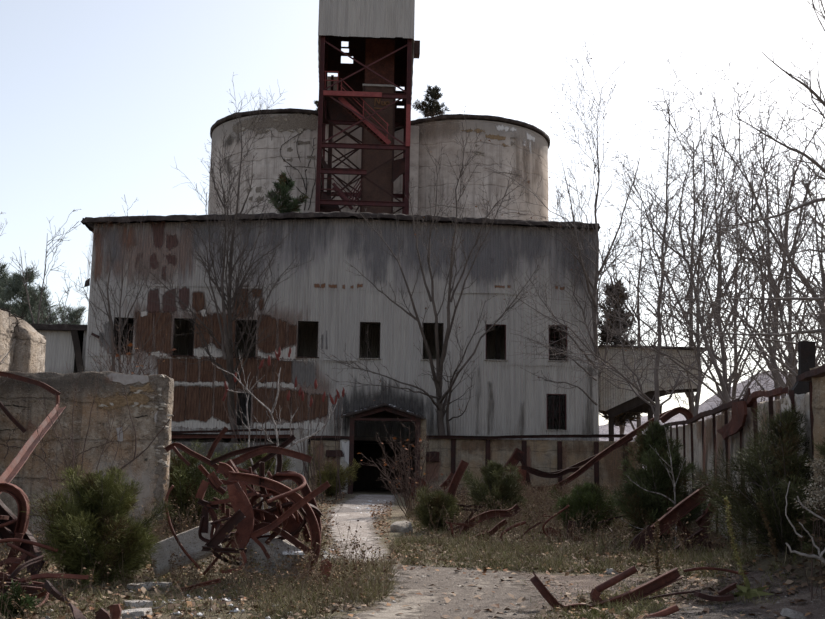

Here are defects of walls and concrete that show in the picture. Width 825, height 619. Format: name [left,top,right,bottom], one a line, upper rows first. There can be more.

rust [88,221,113,279]
rust [150,221,178,280]
peeling [194,343,223,358]
rust [133,285,346,425]
peeling [257,382,296,390]
spalling [144,375,231,521]
peeling [253,420,324,431]